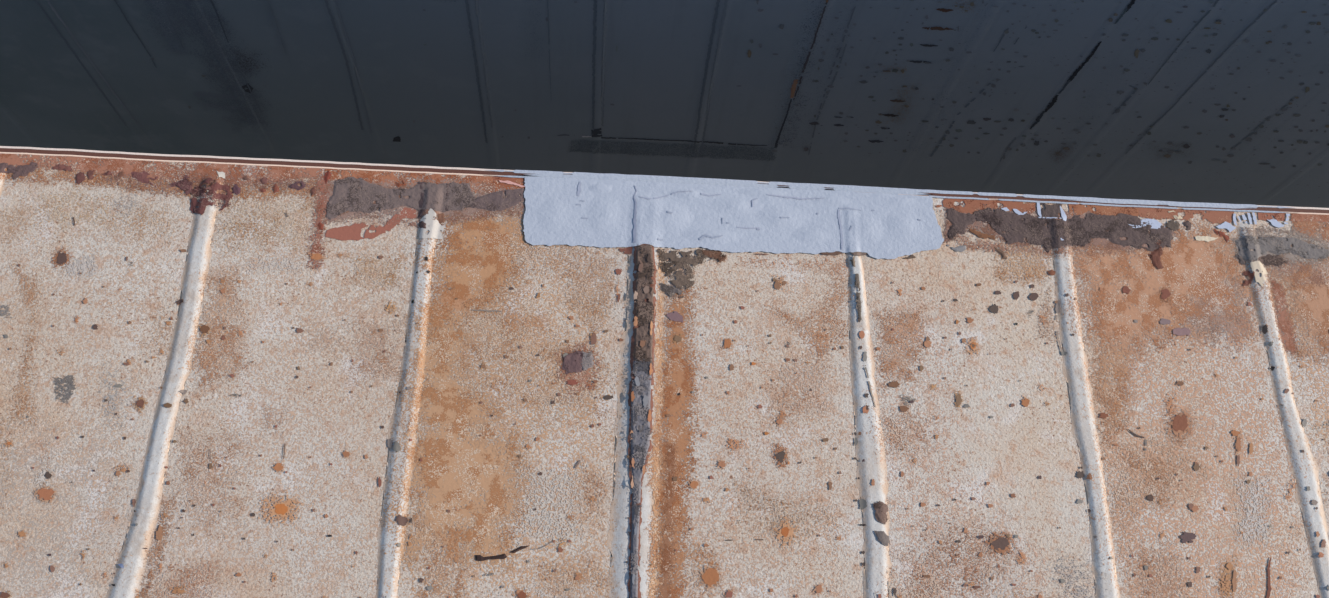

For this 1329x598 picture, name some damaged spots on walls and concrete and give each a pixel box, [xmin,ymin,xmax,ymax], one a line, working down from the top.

crack [1030,0,1135,129]
peeling [0,162,525,230]
spalling [989,284,1039,314]
peeling [947,203,1329,286]
rust [0,154,1329,598]
peeling [604,244,727,598]